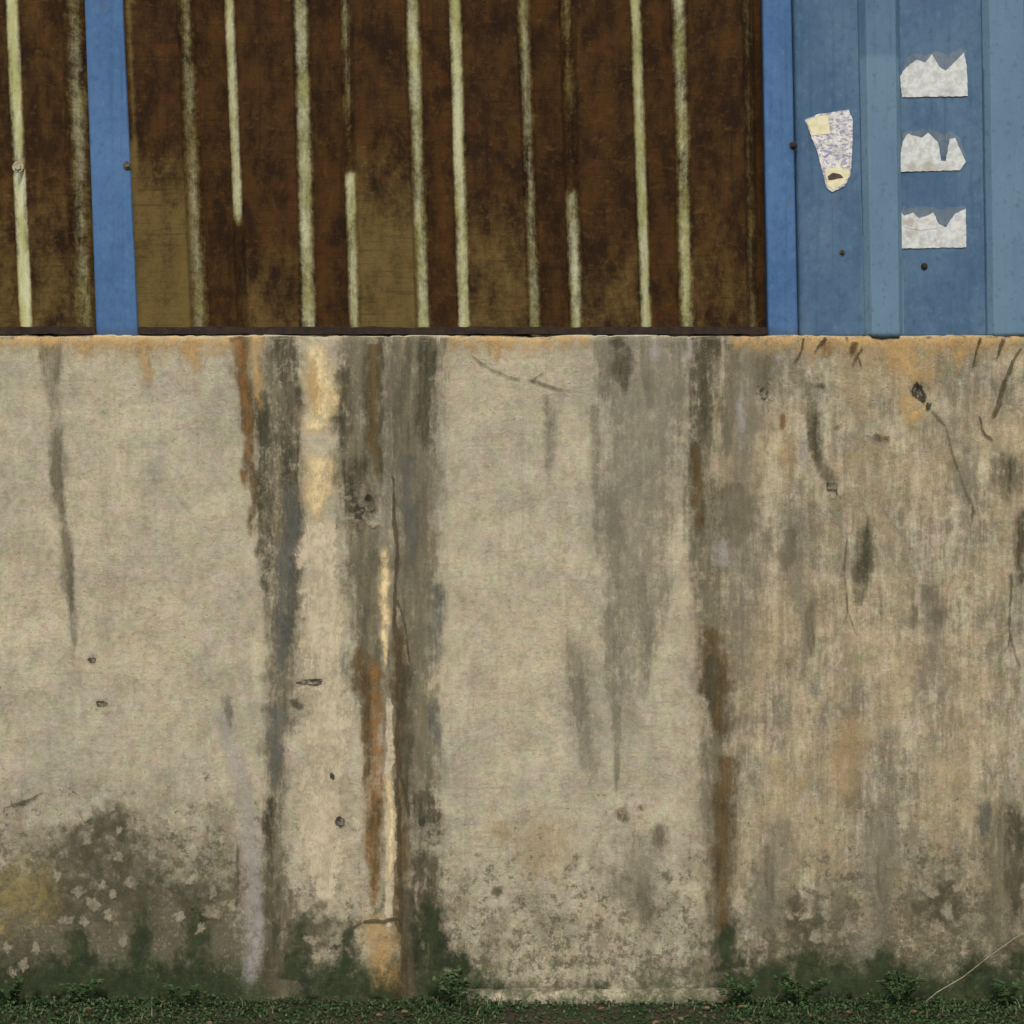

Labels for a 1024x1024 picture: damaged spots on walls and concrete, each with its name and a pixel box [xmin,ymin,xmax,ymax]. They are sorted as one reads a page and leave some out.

damp [38,337,75,639]
rust [0,335,263,530]
damp [220,336,476,999]
rust [361,660,383,902]
crack [350,476,410,999]
damp [593,336,770,972]
damp [853,519,874,600]
crack [933,411,976,517]
damp [129,903,151,973]
damp [182,908,211,973]